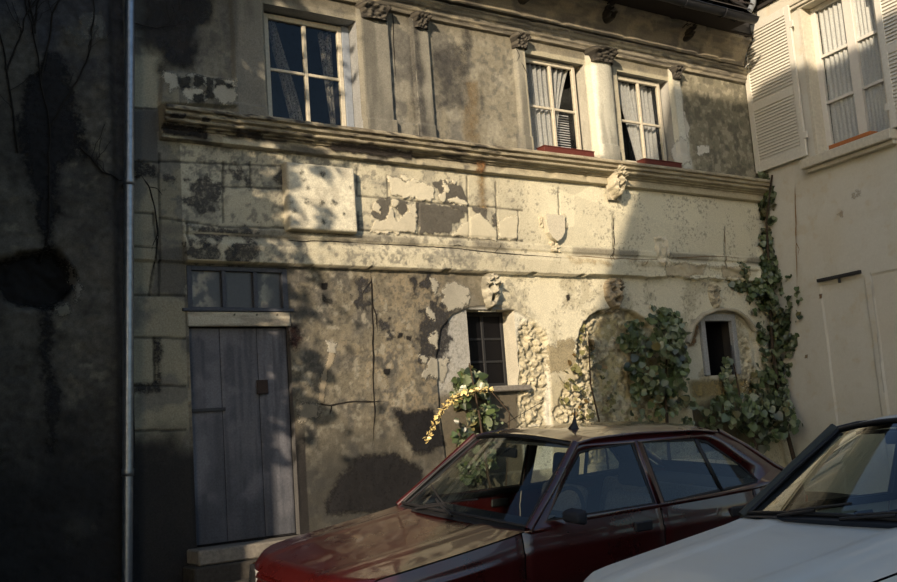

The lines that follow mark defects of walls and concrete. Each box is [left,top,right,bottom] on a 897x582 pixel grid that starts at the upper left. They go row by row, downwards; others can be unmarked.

peeling [161,71,238,106]
leakage [412,60,424,84]
leakage [434,30,471,106]
peeling [370,175,468,235]
peeling [451,213,518,241]
peeling [429,277,471,311]
crack [320,278,380,444]
peeling [418,306,450,383]